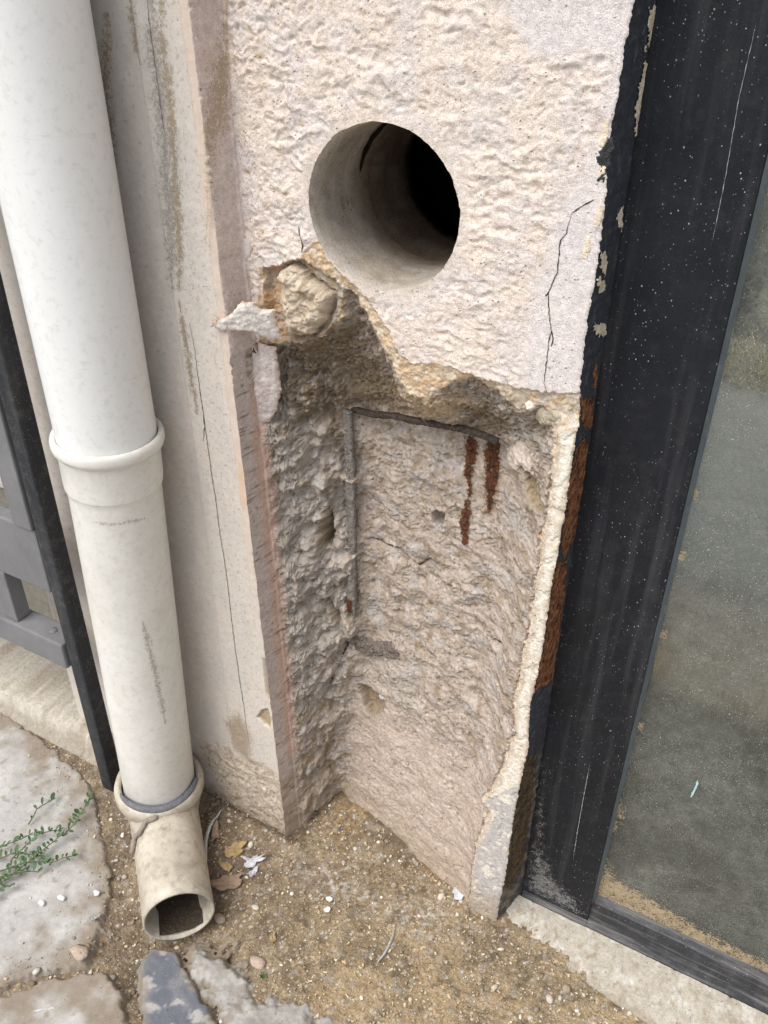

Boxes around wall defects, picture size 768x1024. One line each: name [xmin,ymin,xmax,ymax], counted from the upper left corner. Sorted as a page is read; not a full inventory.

crack [544,200,593,389]
spalling [202,242,581,922]
corrosion [459,436,500,546]
corrosion [535,364,598,691]